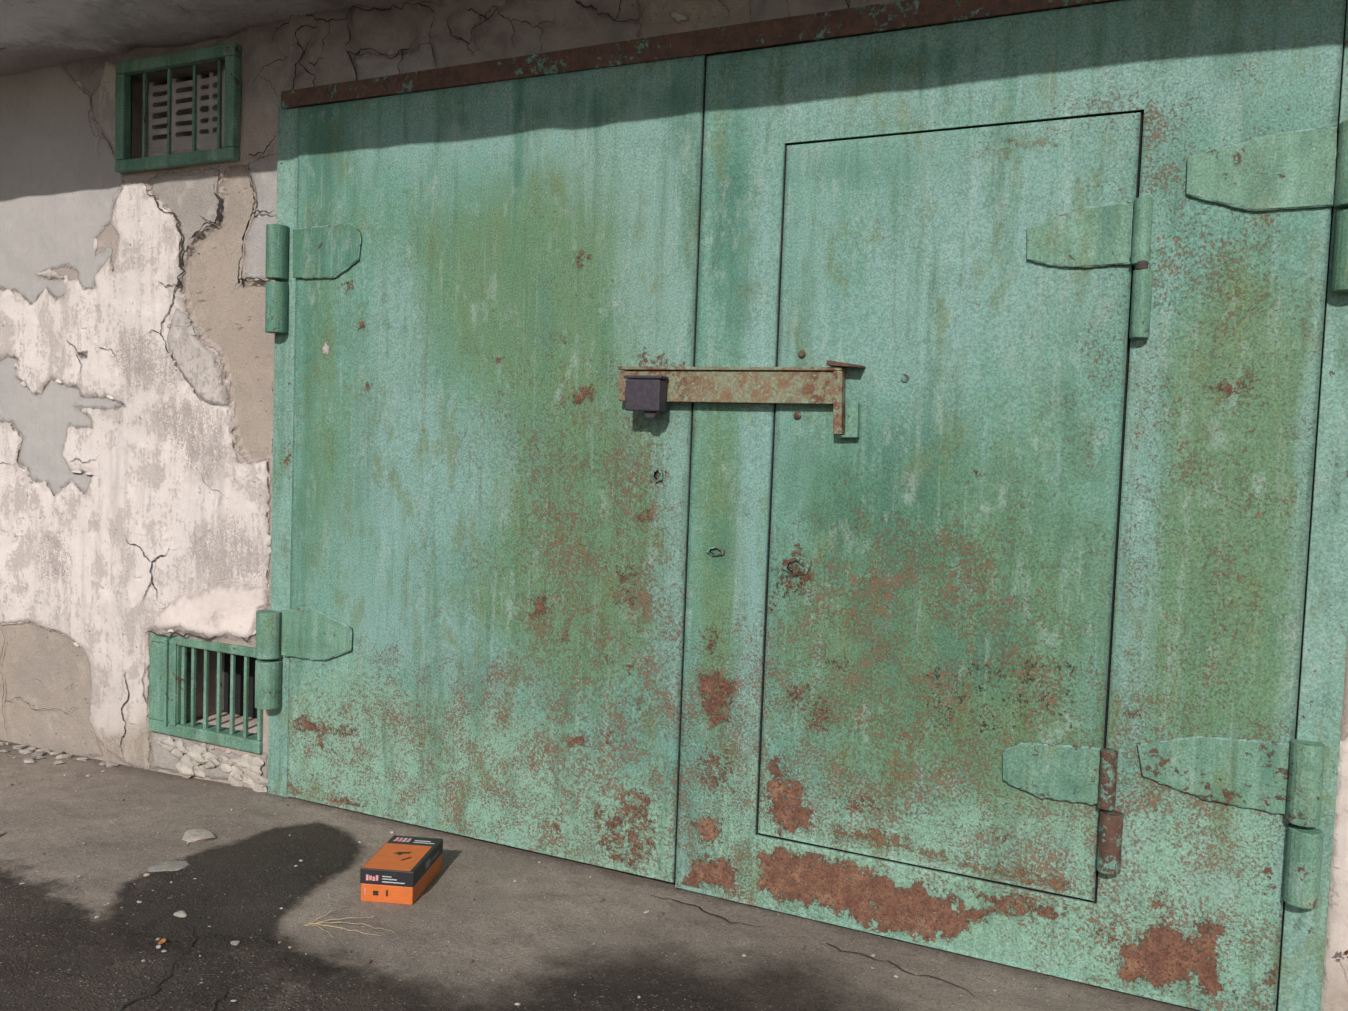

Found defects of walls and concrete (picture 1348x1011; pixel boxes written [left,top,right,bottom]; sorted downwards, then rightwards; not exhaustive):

crack [73,0,645,401]
peeling [0,0,277,780]
crack [124,535,256,642]
crack [120,666,149,757]
rust [681,757,1094,946]
rust [1093,887,1277,1011]
peeling [1321,736,1348,1011]